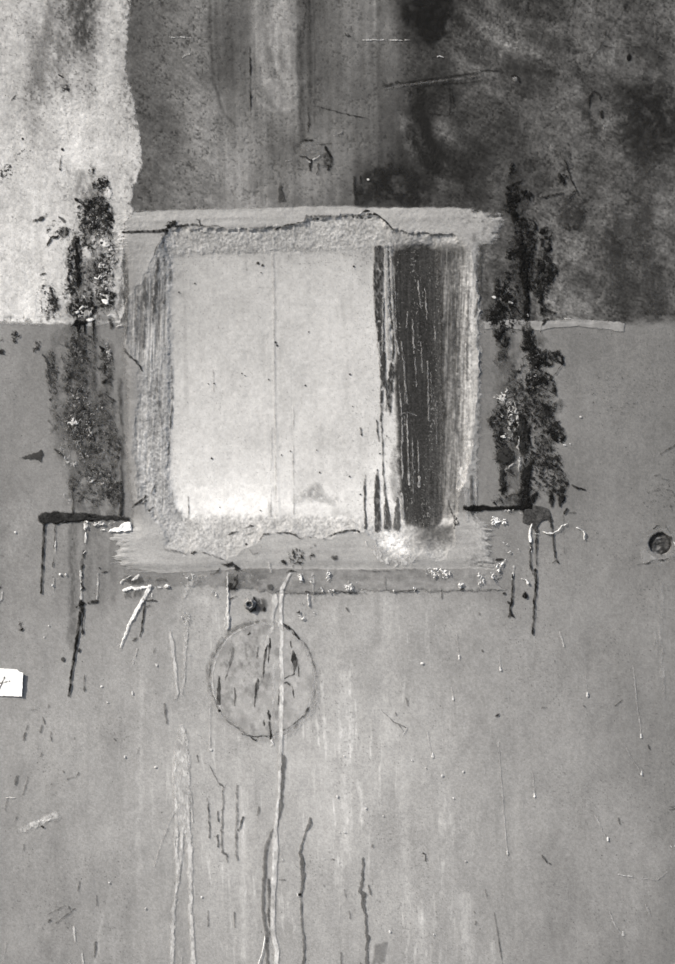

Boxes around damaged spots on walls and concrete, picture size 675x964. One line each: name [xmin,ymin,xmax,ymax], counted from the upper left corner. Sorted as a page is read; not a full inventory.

damp [68,0,95,46]
damp [353,163,420,206]
damp [363,244,468,566]
damp [40,522,56,594]
damp [68,356,124,696]
damp [458,441,477,521]
damp [507,566,515,618]
damp [528,524,538,635]
damp [261,573,291,964]
damp [208,785,244,860]
damp [297,818,312,964]
damp [358,857,371,964]